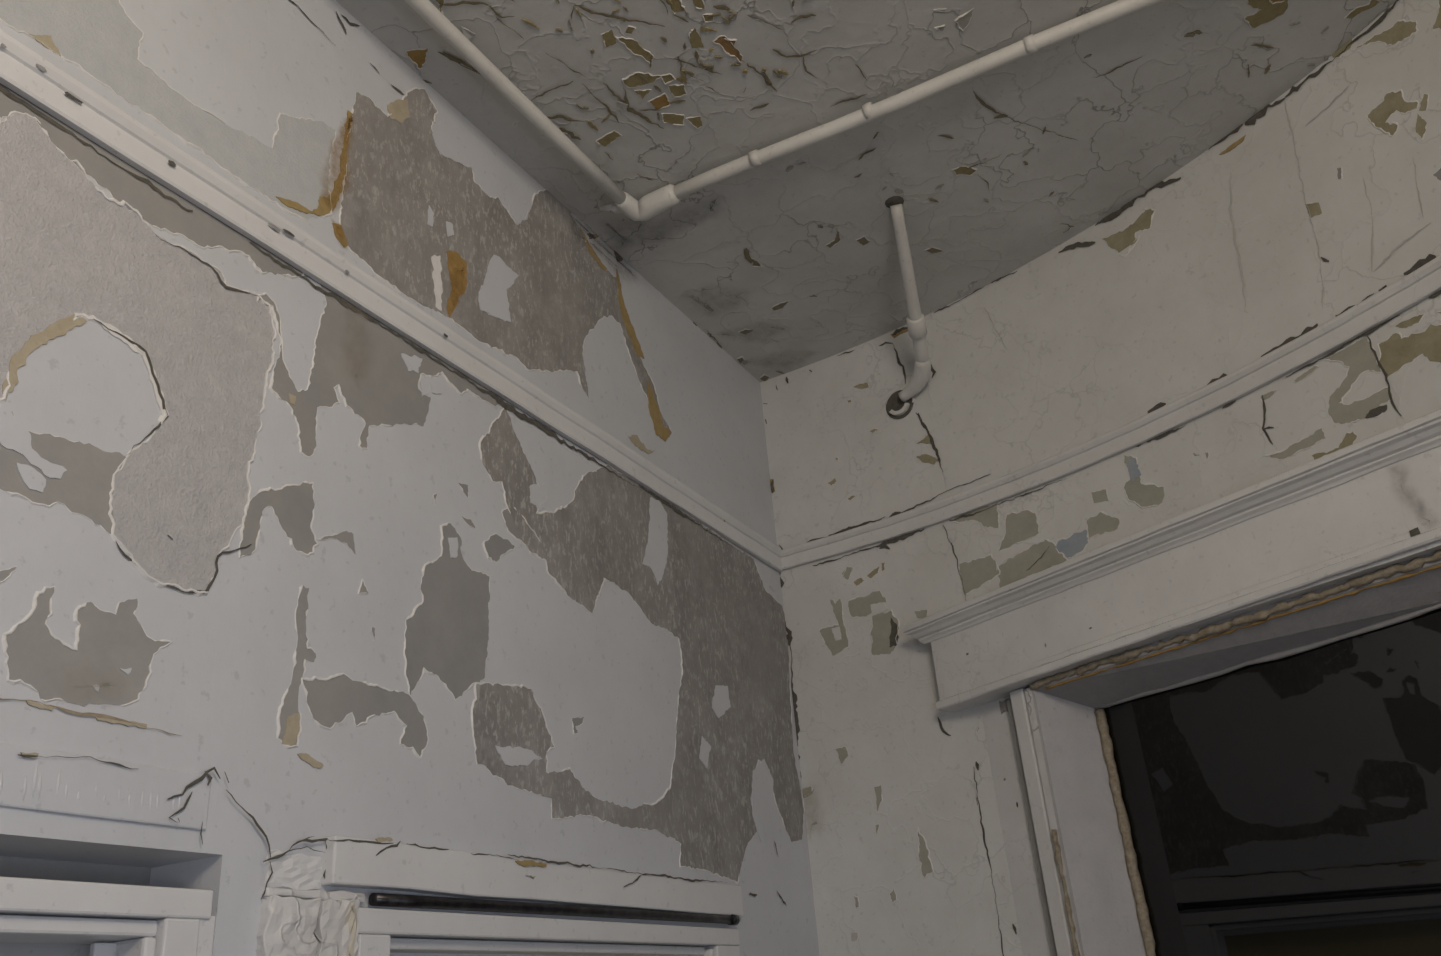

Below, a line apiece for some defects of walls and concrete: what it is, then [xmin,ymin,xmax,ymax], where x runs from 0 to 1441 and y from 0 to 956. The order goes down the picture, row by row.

peeling [0,0,672,454]
peeling [435,0,816,160]
crack [1059,177,1181,253]
crack [1208,0,1398,307]
crack [1261,159,1441,377]
peeling [0,83,813,885]
peeling [943,455,1165,600]
crack [1135,402,1184,447]
peeling [1260,311,1441,461]
peeling [818,562,928,656]
crack [0,698,181,736]
crack [168,767,787,906]